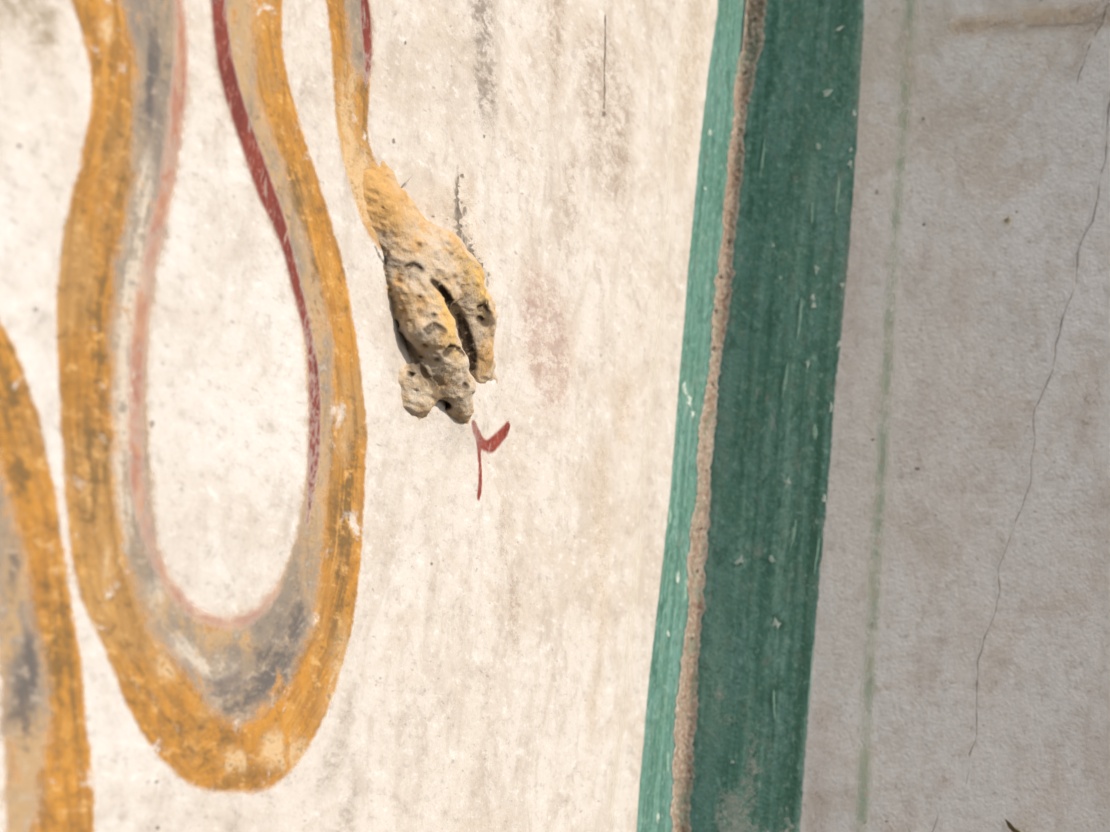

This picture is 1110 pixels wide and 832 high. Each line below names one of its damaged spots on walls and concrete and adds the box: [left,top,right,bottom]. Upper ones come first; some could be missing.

crack [1077,5,1107,84]
crack [966,101,1110,784]